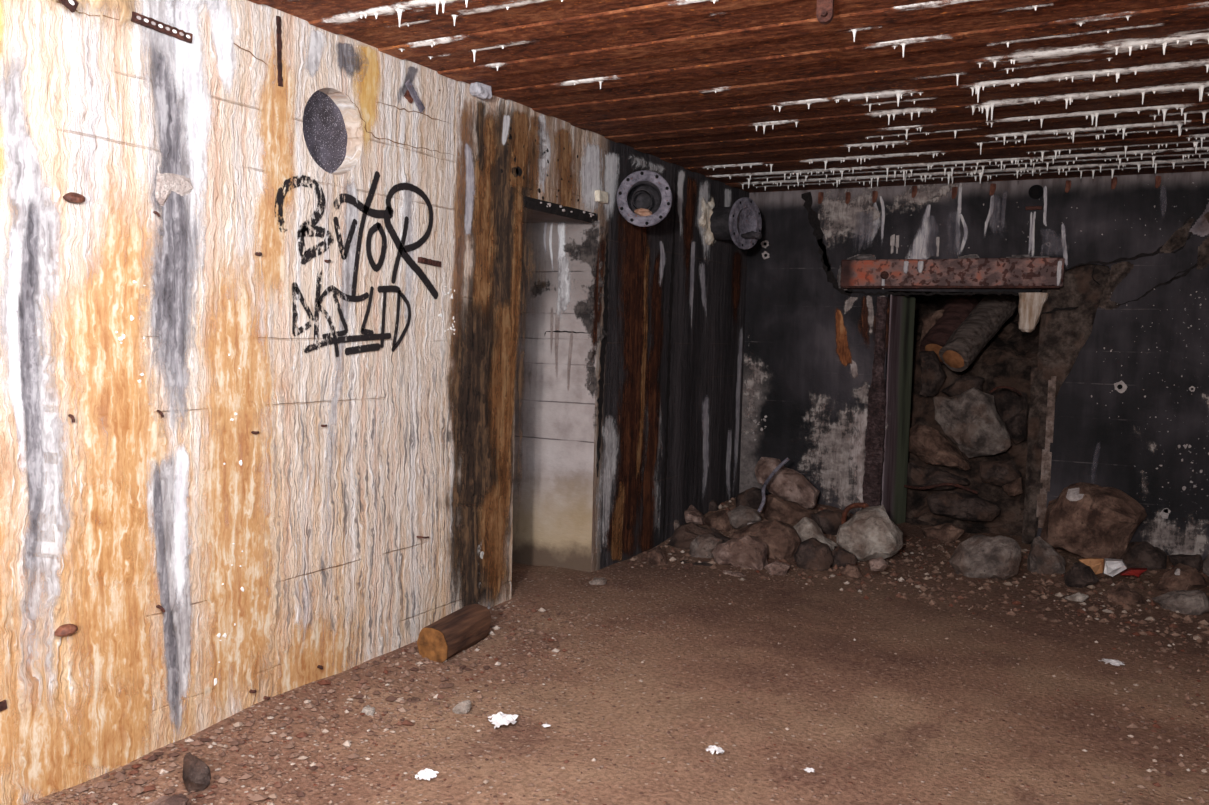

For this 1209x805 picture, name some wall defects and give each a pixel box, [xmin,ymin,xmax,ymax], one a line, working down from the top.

damp [0,52,70,653]
rust [0,199,167,794]
damp [148,446,191,727]
damp [142,0,236,420]
rust [196,46,355,708]
damp [306,0,563,77]
damp [446,96,570,607]
damp [561,75,617,89]
crack [801,192,1036,296]
damp [894,0,980,9]
damp [690,14,1209,325]
crack [1064,213,1200,305]